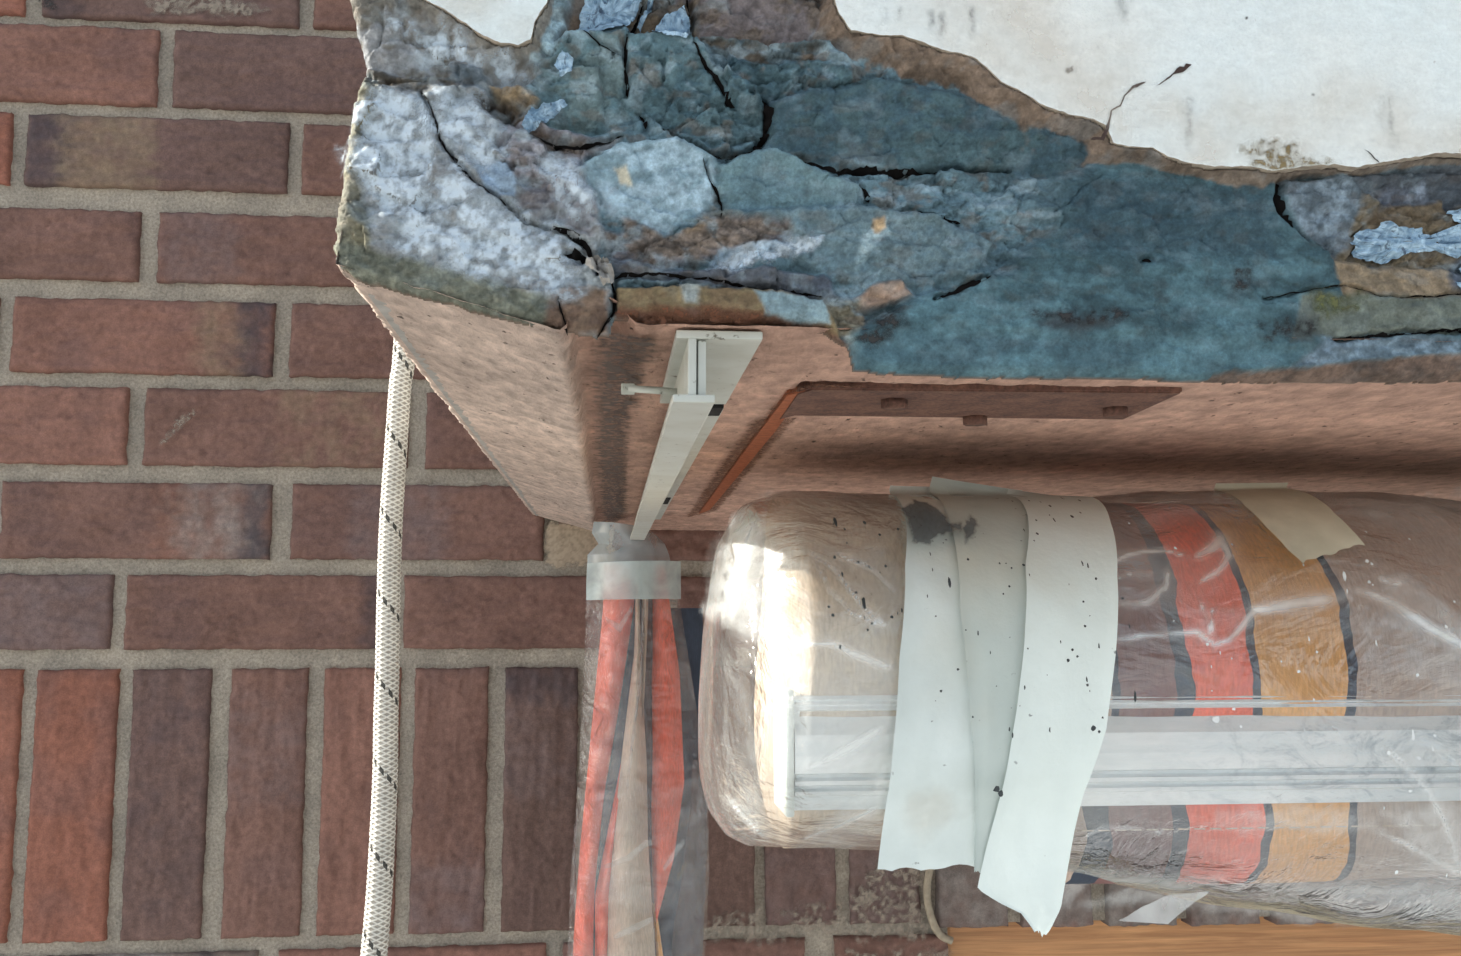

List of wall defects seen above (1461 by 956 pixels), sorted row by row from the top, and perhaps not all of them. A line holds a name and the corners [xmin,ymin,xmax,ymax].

crack [534,6,665,151]
crack [686,0,774,216]
crack [1091,64,1191,141]
crack [421,92,822,338]
crack [804,162,960,225]
spalling [333,0,1461,385]
crack [934,276,990,300]